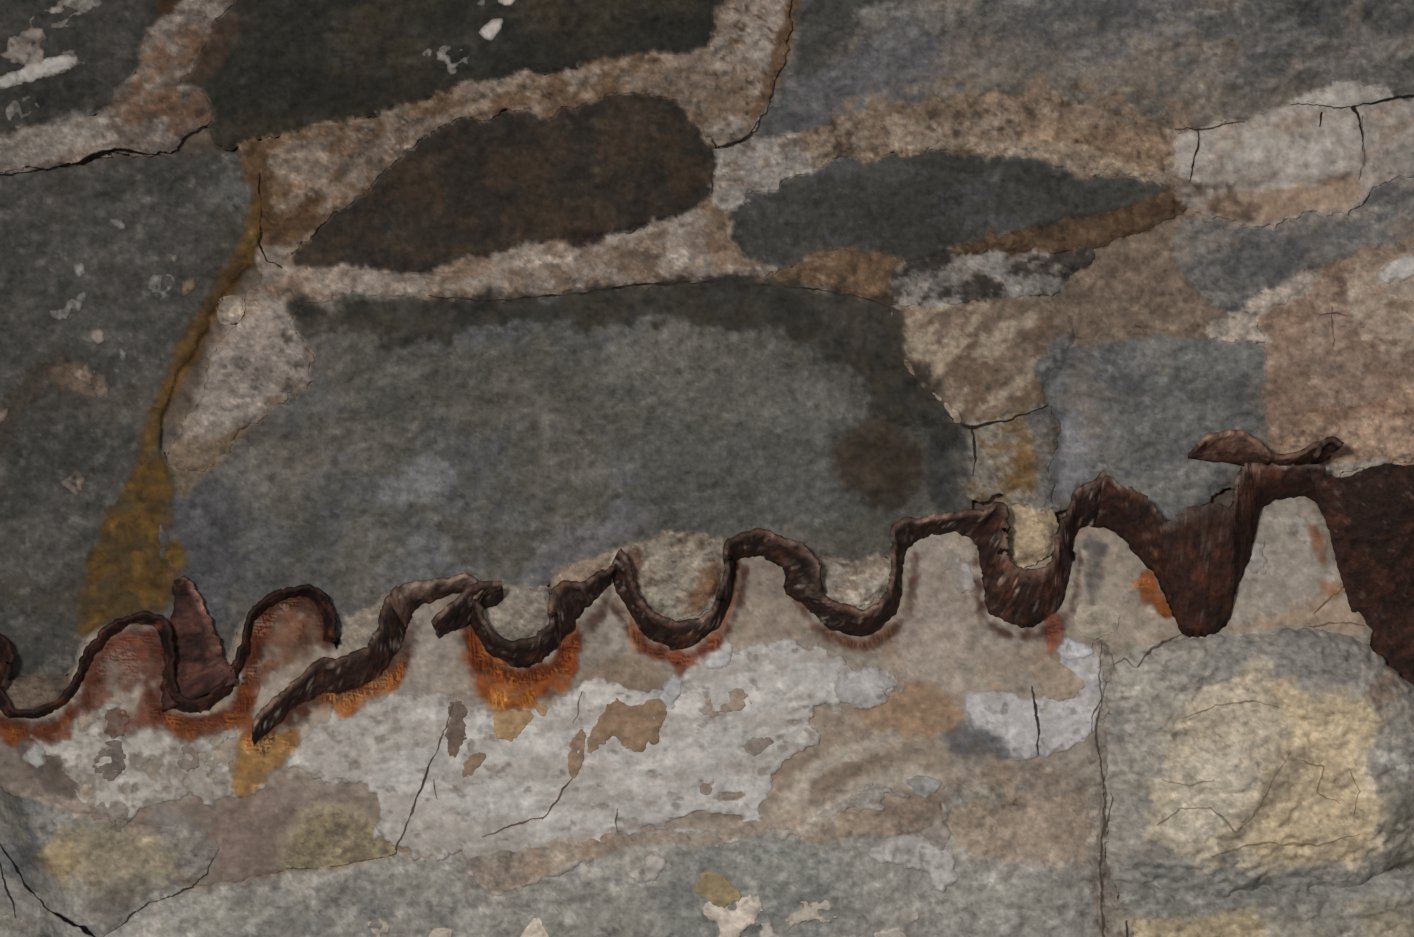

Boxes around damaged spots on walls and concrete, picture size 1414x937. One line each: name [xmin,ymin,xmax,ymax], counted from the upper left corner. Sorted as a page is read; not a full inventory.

crack [1182,121,1245,183]
crack [1290,94,1414,180]
rust [1310,527,1324,561]
rust [463,561,749,711]
rust [815,625,900,649]
rust [974,561,1063,649]
rust [1134,570,1171,616]
rust [0,596,410,797]